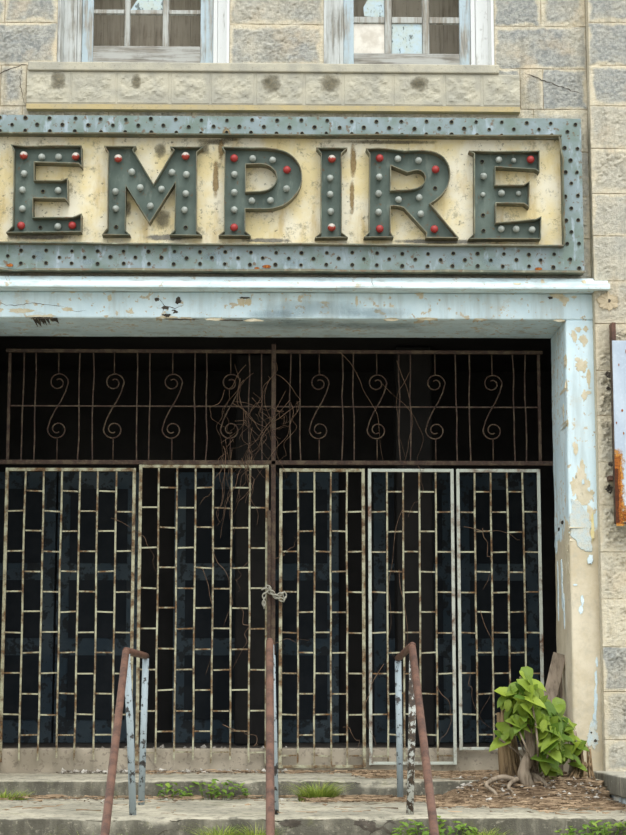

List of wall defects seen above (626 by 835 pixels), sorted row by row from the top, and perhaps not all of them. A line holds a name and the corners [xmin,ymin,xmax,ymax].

peeling [571,326,589,347]
peeling [563,354,591,402]
rust [614,449,626,526]